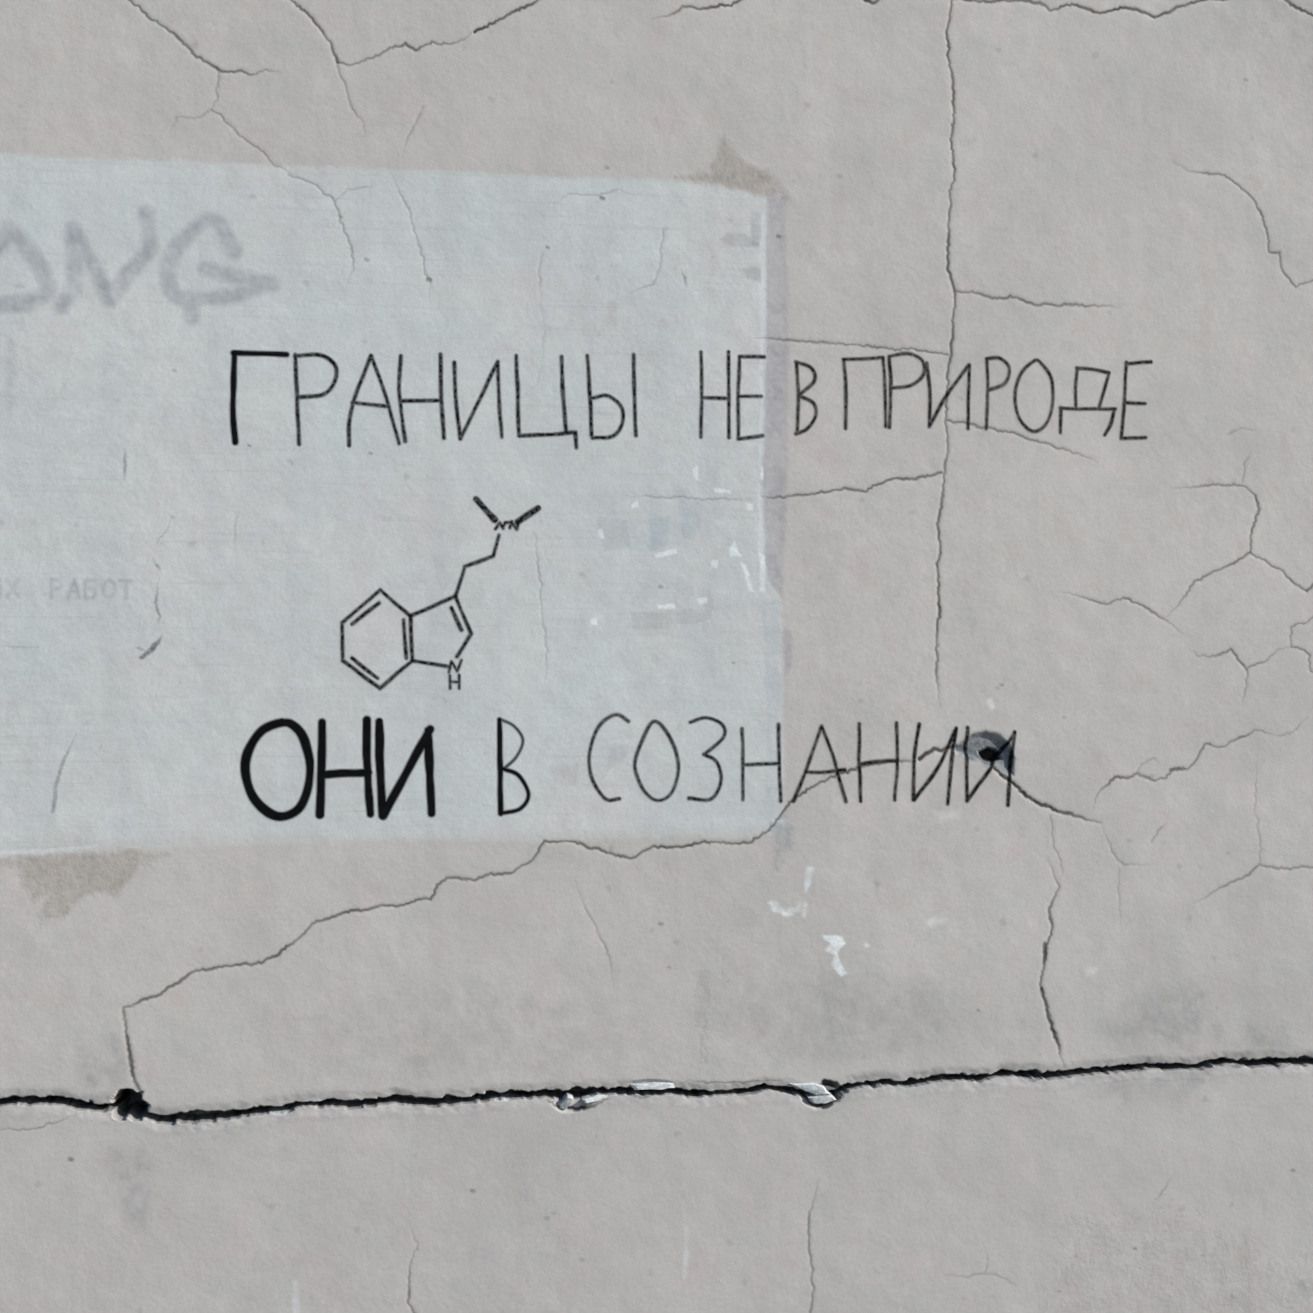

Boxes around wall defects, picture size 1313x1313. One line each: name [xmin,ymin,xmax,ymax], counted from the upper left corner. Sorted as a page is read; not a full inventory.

crack [288,0,542,137]
crack [1283,0,1313,18]
crack [127,0,432,304]
crack [1171,161,1313,290]
crack [509,252,547,414]
crack [621,0,1229,708]
crack [0,426,1313,1138]
crack [944,1252,1020,1290]